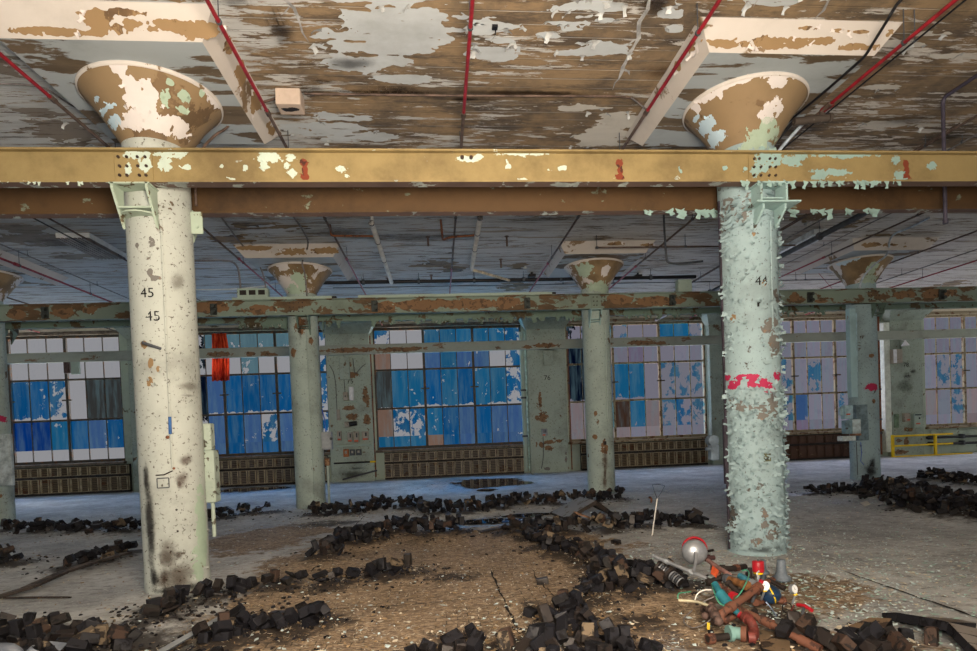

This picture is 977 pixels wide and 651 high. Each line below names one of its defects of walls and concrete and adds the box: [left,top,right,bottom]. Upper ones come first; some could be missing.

peeling [7,7,232,55]
peeling [308,0,633,85]
peeling [657,0,684,33]
peeling [727,0,803,17]
peeling [674,23,972,75]
peeling [0,65,220,175]
peeling [266,111,399,146]
peeling [554,103,638,149]
peeling [220,152,297,180]
corrosion [299,158,309,180]
peeling [665,74,913,552]
leakage [144,469,196,591]